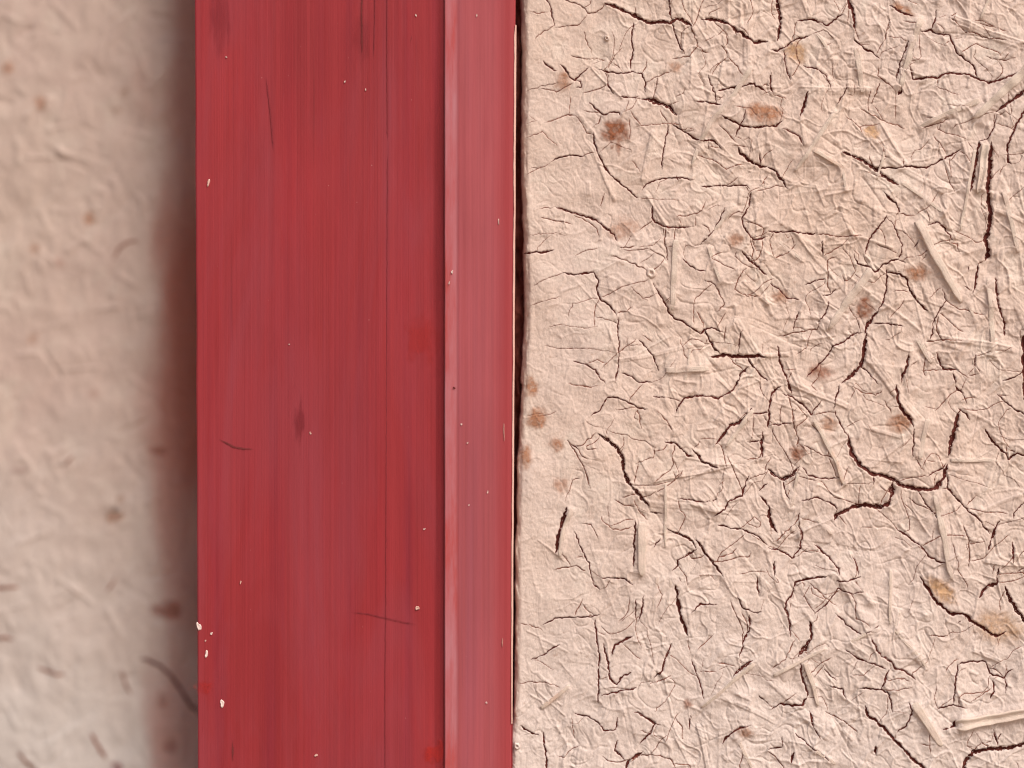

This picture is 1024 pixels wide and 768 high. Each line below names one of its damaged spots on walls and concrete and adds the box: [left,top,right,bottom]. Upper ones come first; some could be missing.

crack [513,0,1024,768]